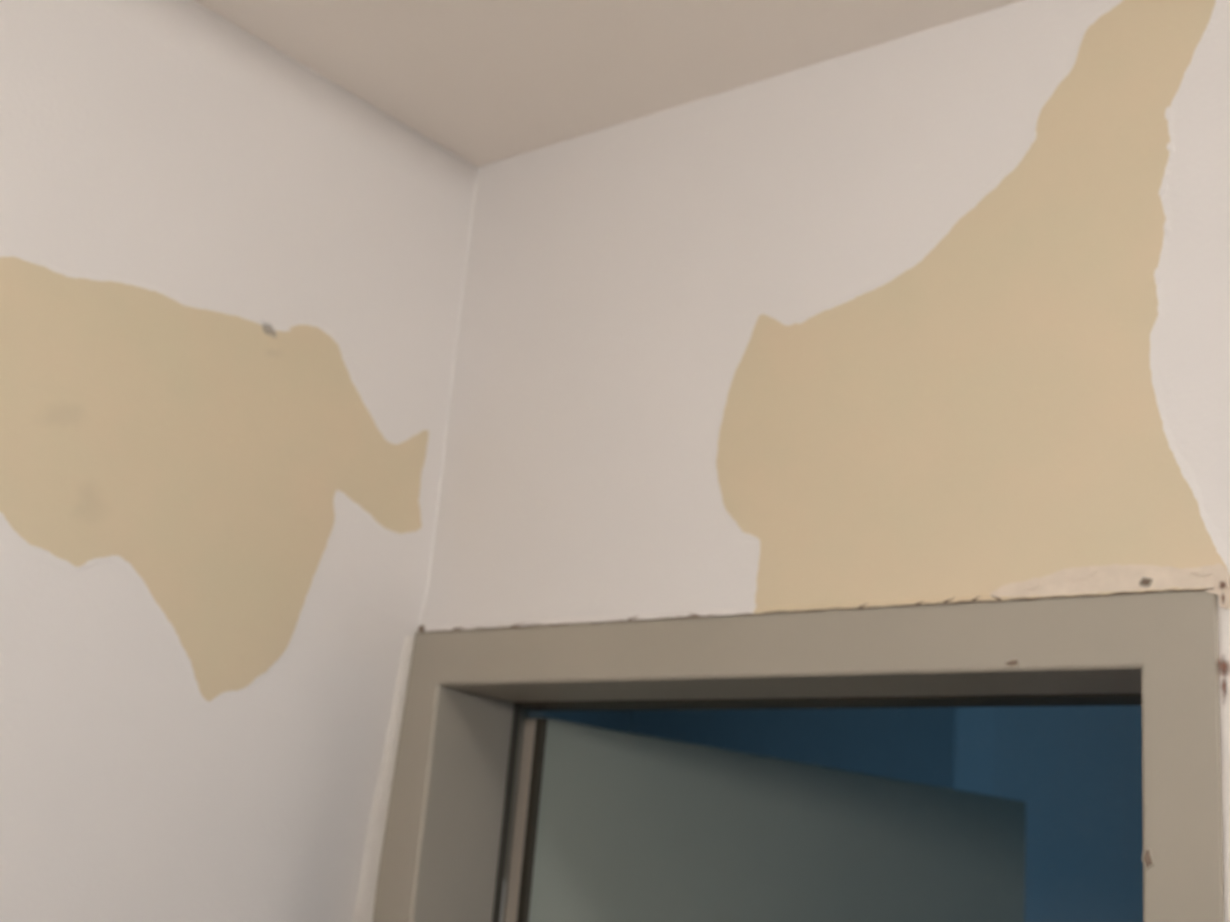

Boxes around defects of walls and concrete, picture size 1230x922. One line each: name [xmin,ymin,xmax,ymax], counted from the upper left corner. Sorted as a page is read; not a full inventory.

peeling [0,249,432,707]
peeling [712,0,1230,609]